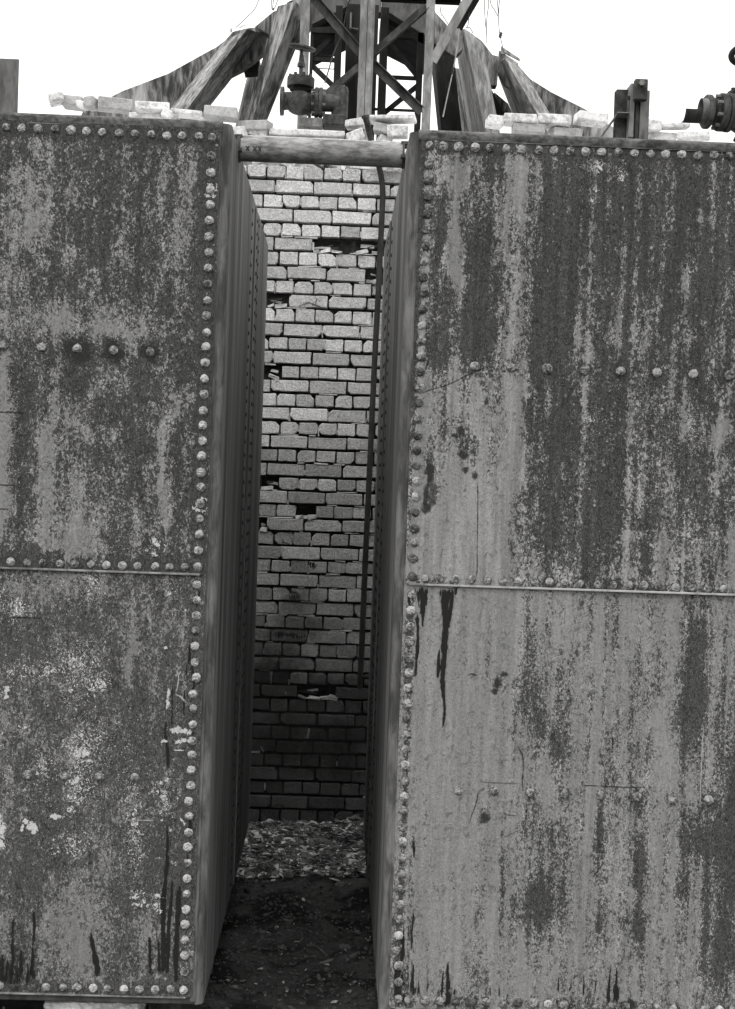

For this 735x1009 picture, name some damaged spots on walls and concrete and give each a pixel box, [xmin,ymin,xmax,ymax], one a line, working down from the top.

spalling [313,240,378,256]
spalling [366,271,376,285]
spalling [267,295,289,309]
rust [62,337,123,364]
rust [139,346,160,362]
rust [459,450,477,479]
rust [422,464,434,513]
spalling [295,505,317,520]
spalling [297,685,338,701]